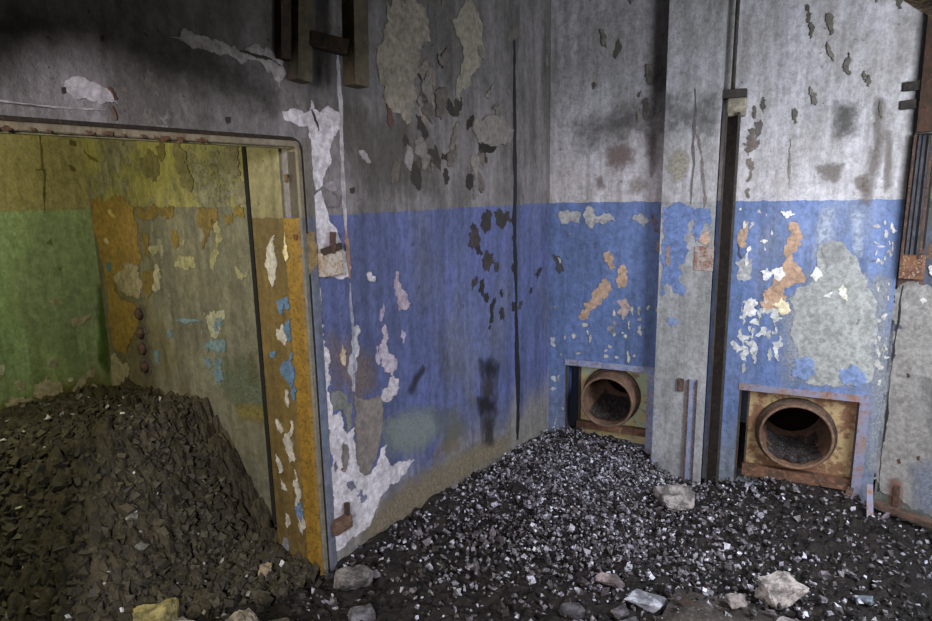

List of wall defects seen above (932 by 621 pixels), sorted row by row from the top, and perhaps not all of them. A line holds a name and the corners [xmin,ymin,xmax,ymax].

peeling [264,100,355,287]
peeling [627,202,713,296]
leakage [669,151,689,182]
peeling [743,97,766,199]
leakage [818,165,840,182]
leakage [835,106,855,133]
leakage [856,100,890,205]
peeling [270,296,297,408]
peeling [578,251,657,363]
peeling [730,210,932,517]
peeling [326,302,414,551]
peeling [275,419,306,552]